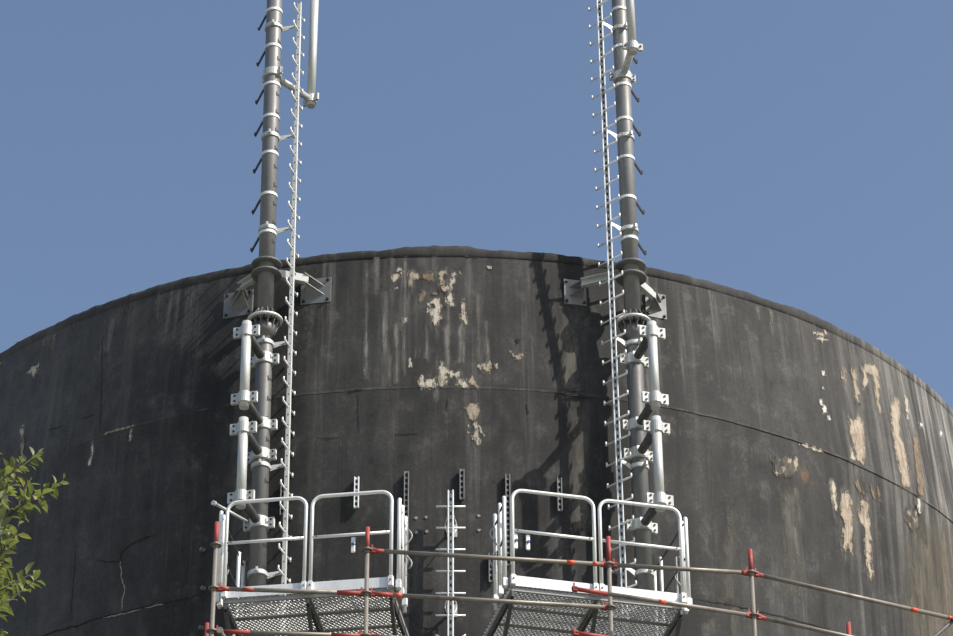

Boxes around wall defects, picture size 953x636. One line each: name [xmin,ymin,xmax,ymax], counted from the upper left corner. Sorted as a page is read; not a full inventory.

peeling [391,268,468,333]
peeling [418,360,498,397]
spalling [464,402,485,446]
peeling [829,351,926,579]